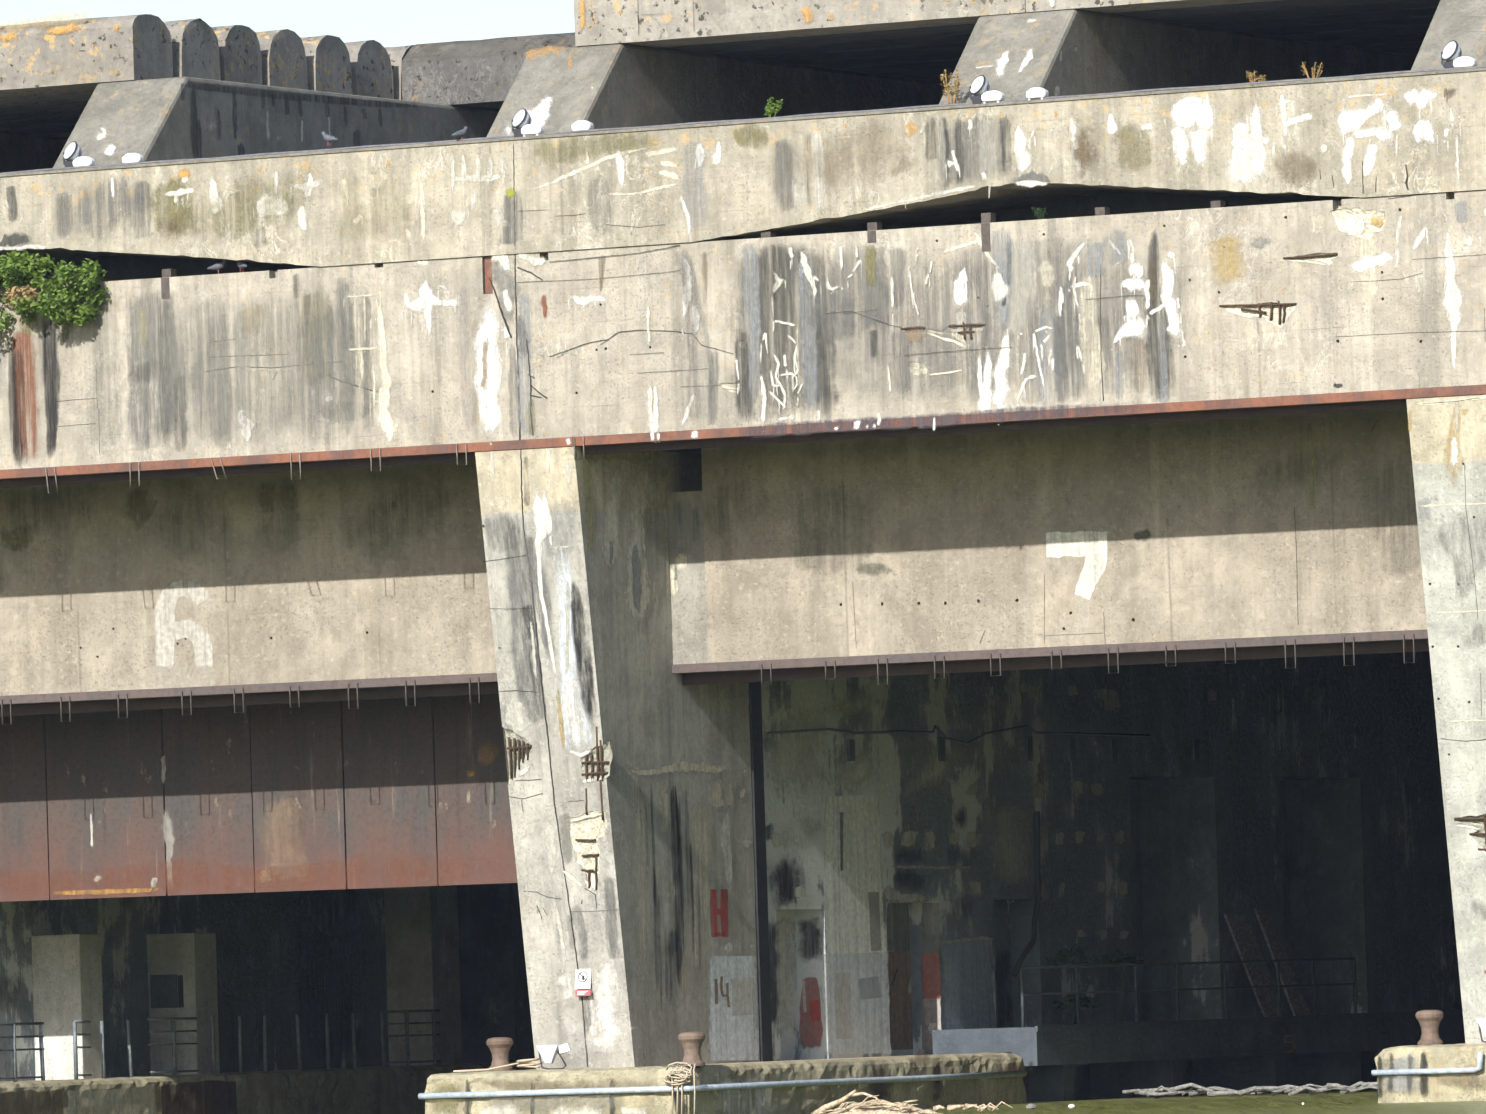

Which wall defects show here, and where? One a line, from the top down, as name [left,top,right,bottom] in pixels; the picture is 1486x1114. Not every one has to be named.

damp [9,355,22,454]
damp [42,320,59,455]
damp [680,357,717,438]
damp [735,247,932,422]
damp [1039,233,1124,400]
damp [1147,233,1171,397]
spalling [1219,301,1297,328]
damp [493,387,698,747]
damp [1134,530,1151,540]
spalling [503,728,533,785]
spalling [569,726,612,892]
spalling [1450,813,1486,855]